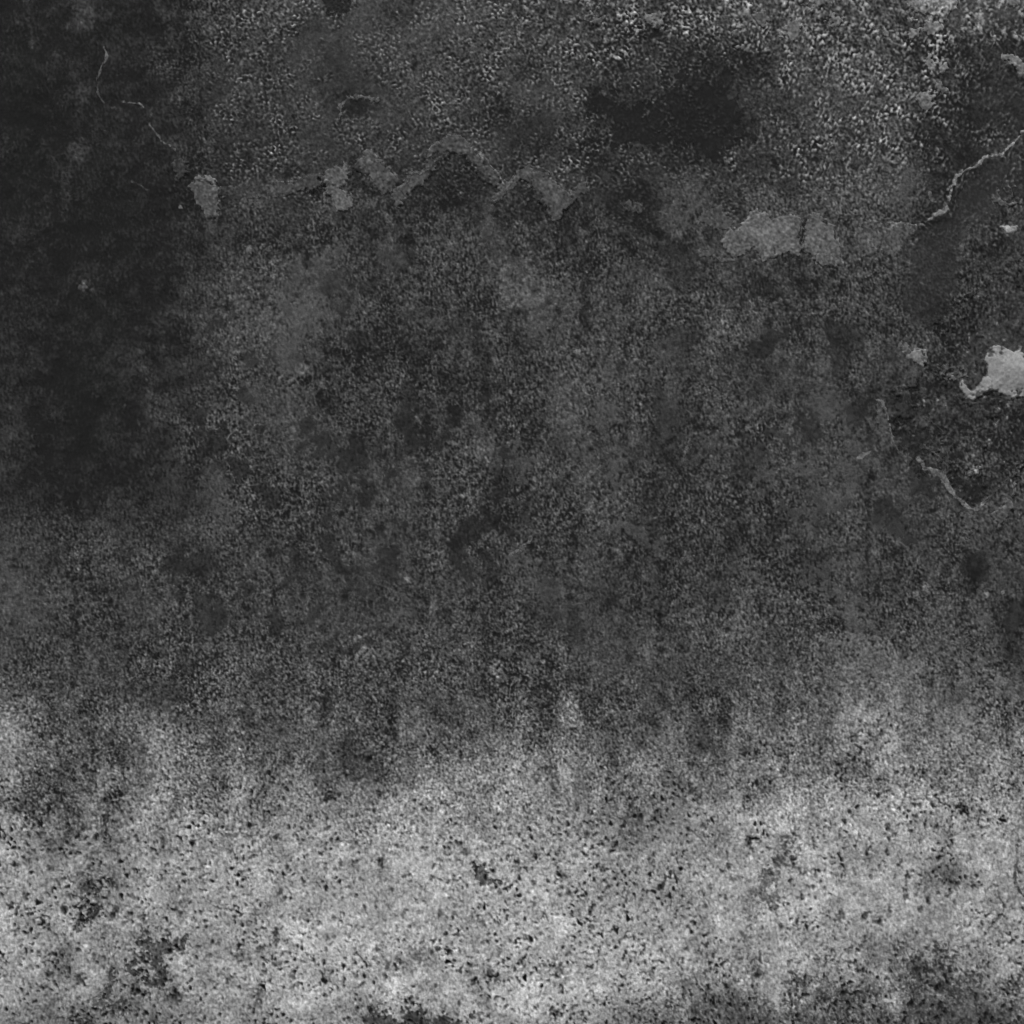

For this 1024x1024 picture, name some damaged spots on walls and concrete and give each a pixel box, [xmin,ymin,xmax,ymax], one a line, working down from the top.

peeling [171,134,590,253]
peeling [620,200,645,213]
peeling [697,206,912,274]
crack [888,130,1024,227]
spalling [872,255,1024,541]